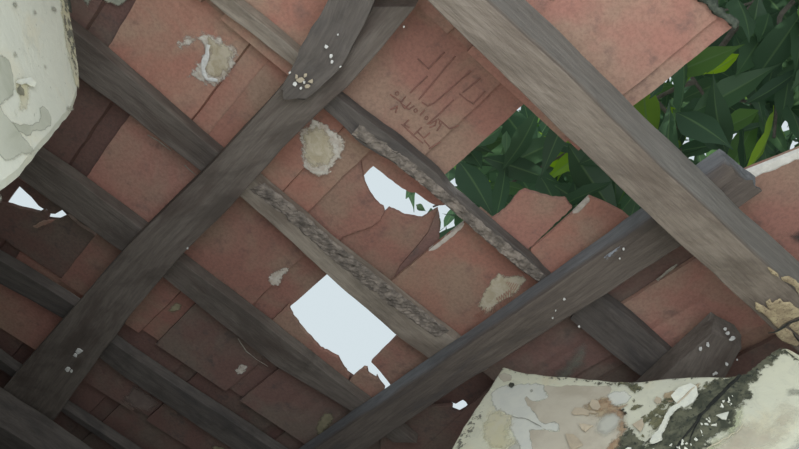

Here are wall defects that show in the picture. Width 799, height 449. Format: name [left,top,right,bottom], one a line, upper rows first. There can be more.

spalling [16,77,36,108]
peeling [13,106,51,135]
peeling [525,385,624,449]
damp [615,348,798,449]
crack [674,374,741,449]